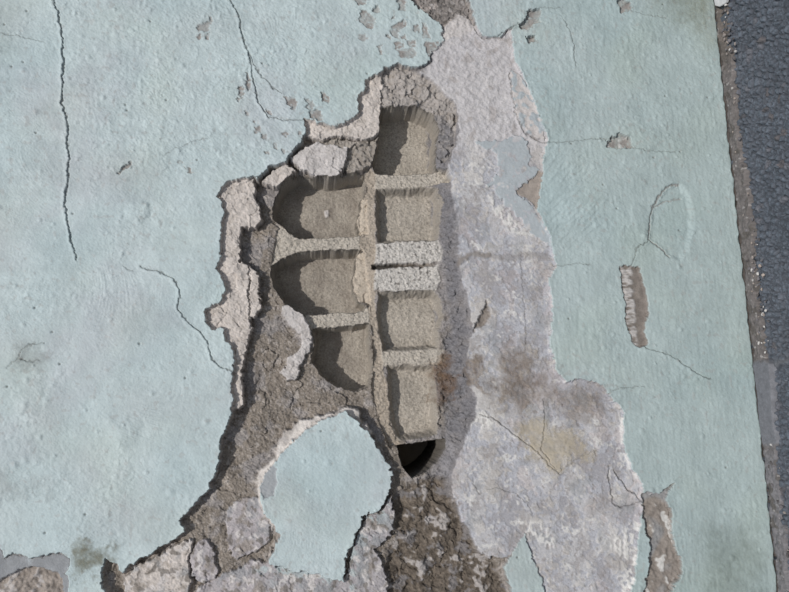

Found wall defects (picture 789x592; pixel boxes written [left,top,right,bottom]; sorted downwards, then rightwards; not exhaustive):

crack [230,0,305,122]
crack [0,0,78,261]
crack [123,265,235,374]
flaking render [100,0,683,592]
crack [641,345,712,380]